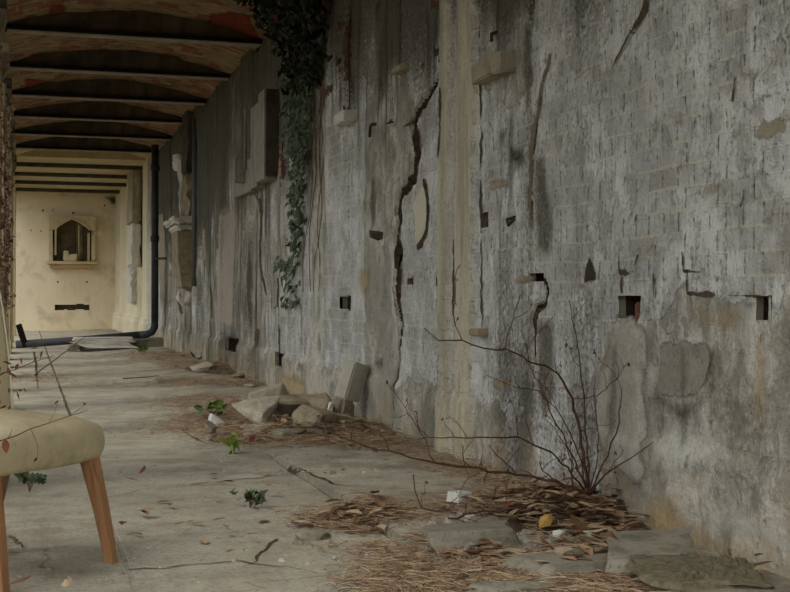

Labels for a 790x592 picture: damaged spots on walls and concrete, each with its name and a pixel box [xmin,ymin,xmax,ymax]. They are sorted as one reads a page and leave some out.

crack [612,0,648,68]
crack [527,54,551,229]
crack [392,59,441,425]
peeling [412,179,429,250]
crack [530,281,549,399]